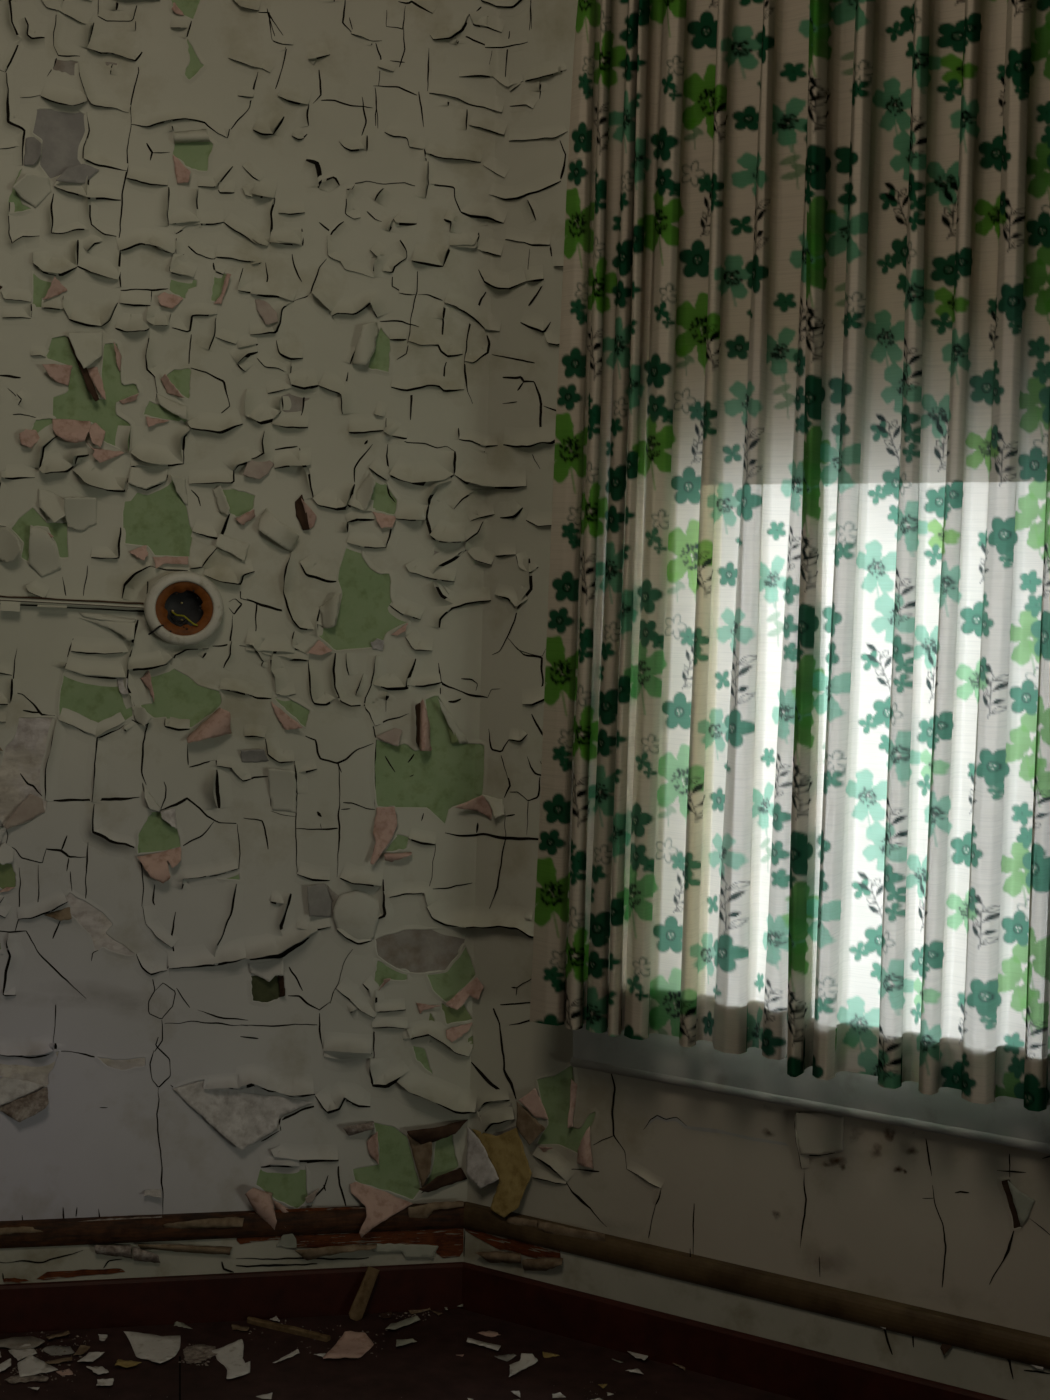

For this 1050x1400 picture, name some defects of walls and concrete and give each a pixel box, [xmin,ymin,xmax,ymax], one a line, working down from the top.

peeling [0,489,97,576]
peeling [19,331,196,568]
peeling [0,663,232,894]
peeling [368,692,505,867]
peeling [307,884,484,1056]
crack [0,1250,121,1279]
crack [221,1257,369,1273]
peeling [95,1075,549,1263]
crack [788,1108,836,1275]
crack [884,1330,914,1355]
crack [922,1140,969,1287]
crack [989,1220,1050,1285]